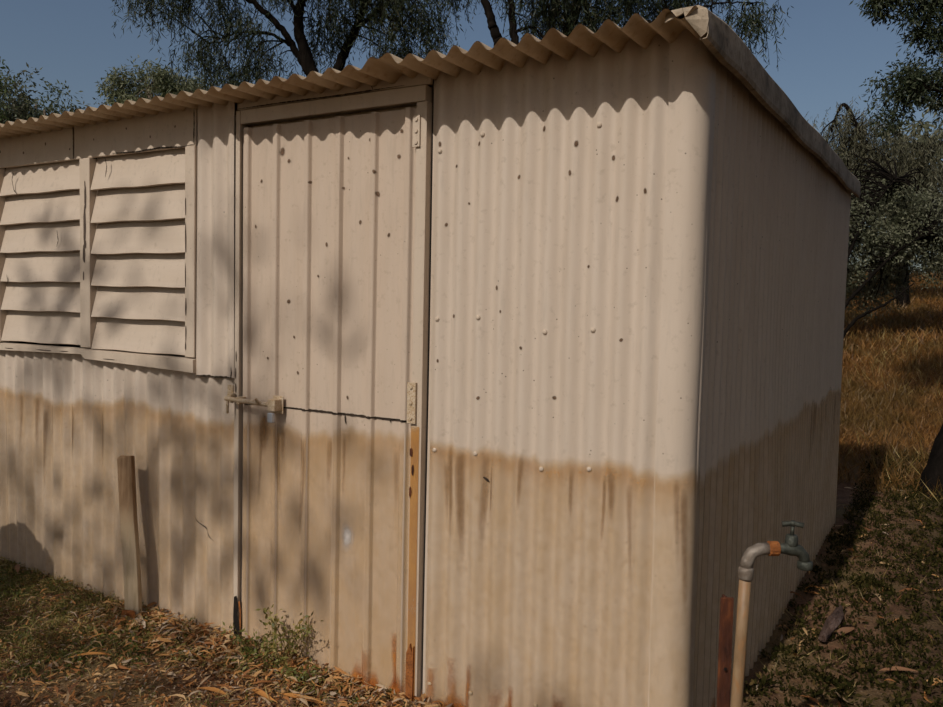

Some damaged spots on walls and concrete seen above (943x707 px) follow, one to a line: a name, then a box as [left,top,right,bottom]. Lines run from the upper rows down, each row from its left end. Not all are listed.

leakage [407,427,419,700]
rust [349,641,401,697]
rust [427,675,469,707]